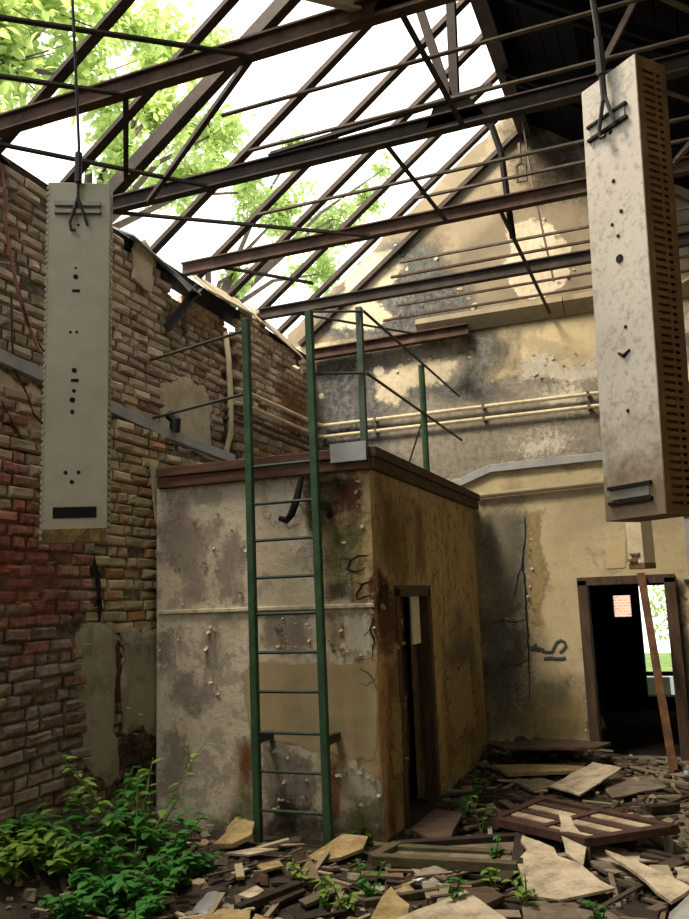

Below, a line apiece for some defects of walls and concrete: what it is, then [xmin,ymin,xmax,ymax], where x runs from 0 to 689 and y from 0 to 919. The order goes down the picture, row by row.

damp [319,287,477,343]
damp [382,244,447,284]
peeling [503,217,572,264]
peeling [507,268,575,300]
damp [316,362,360,450]
peeling [316,341,602,479]
crack [343,555,377,690]
damp [478,508,587,739]